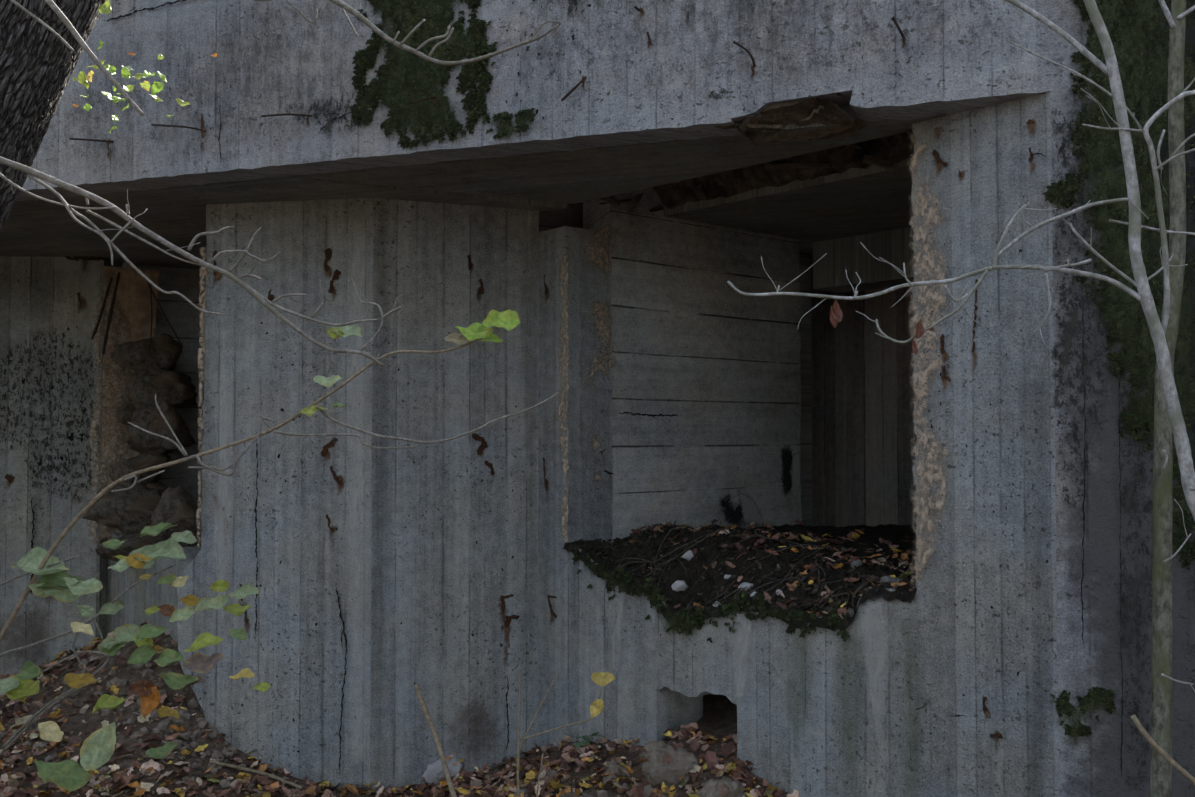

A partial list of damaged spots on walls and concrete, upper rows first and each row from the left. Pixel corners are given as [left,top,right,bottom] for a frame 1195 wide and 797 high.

spalling [715,92,868,145]
corrosion [932,128,965,180]
corrosion [1026,119,1036,172]
spalling [909,138,967,581]
corrosion [321,437,343,492]
corrosion [472,433,494,483]
corrosion [499,594,519,664]
crack [336,590,347,771]